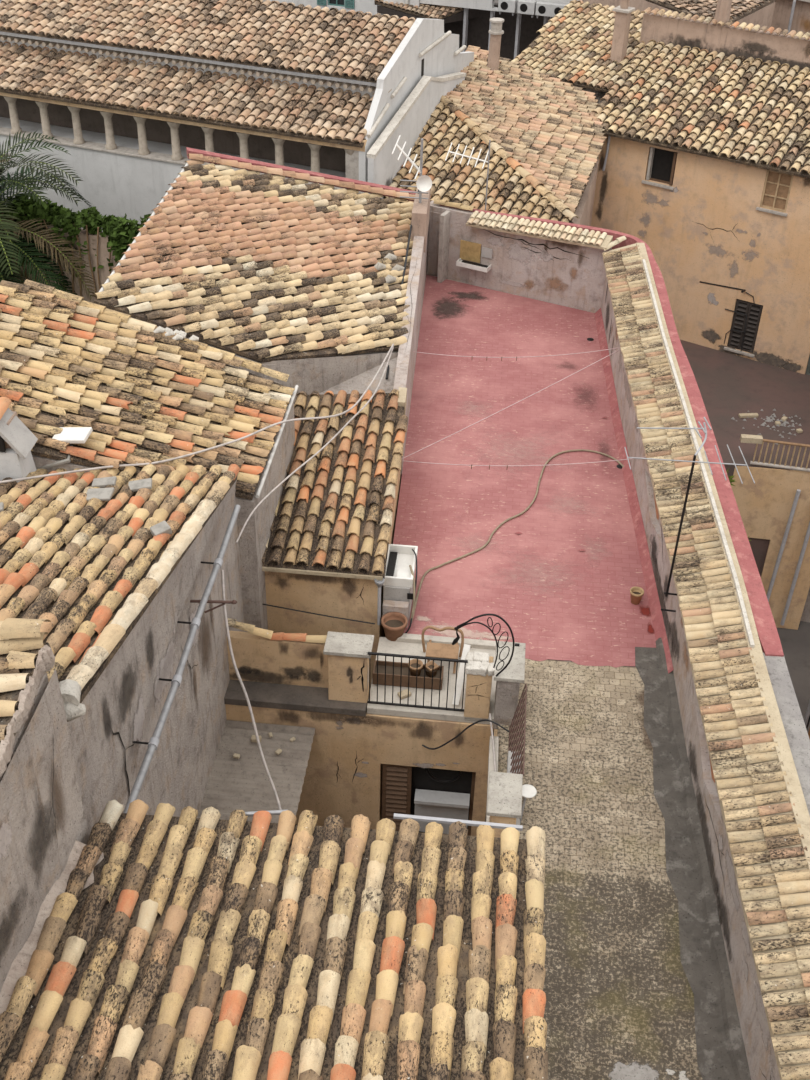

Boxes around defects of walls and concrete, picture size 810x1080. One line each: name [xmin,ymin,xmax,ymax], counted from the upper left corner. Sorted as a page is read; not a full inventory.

leakage [435,292,484,318]